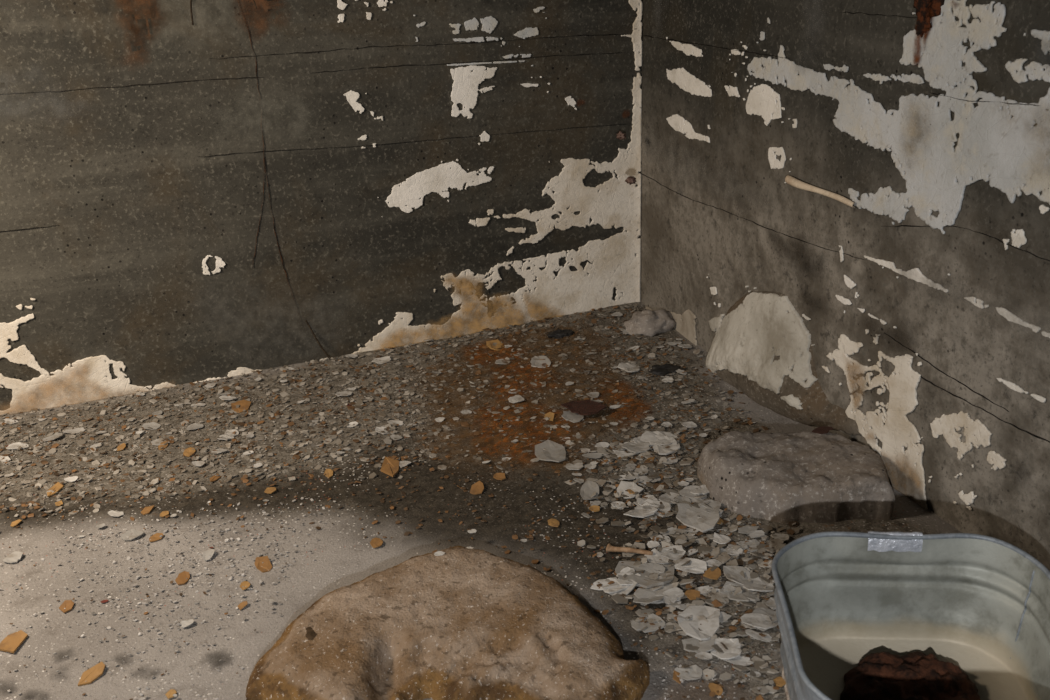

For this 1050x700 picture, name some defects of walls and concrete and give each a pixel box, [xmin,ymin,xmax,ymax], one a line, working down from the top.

peeling [337,0,652,364]
peeling [666,37,703,57]
peeling [666,114,710,143]
peeling [666,68,712,97]
crack [641,173,865,260]
peeling [724,0,1050,234]
corrosion [914,9,932,64]
peeling [1003,229,1027,250]
peeling [0,298,176,424]
peeling [649,275,1006,510]
crack [884,333,1050,443]
peeling [565,417,789,642]